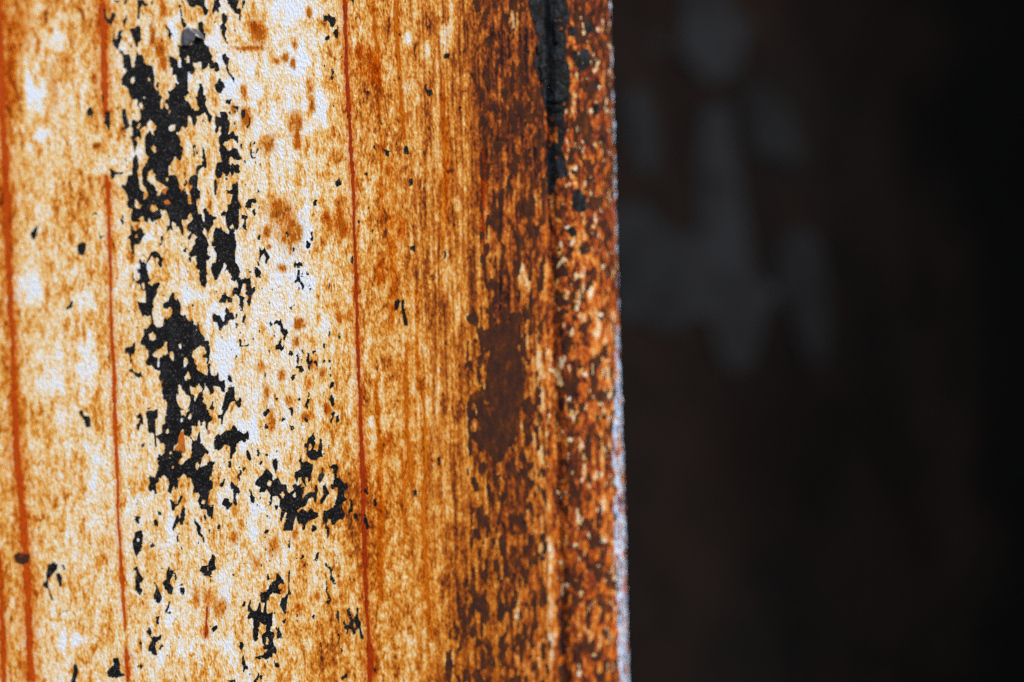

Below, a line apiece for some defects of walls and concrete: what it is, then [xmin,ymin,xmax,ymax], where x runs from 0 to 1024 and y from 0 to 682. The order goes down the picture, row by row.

rust [0,1,36,682]
peeling [43,562,65,600]
rust [99,2,108,118]
rust [105,175,126,630]
peeling [87,0,377,682]
rust [237,22,265,51]
rust [264,201,300,253]
rust [326,0,384,682]
rust [401,343,434,638]
rust [445,0,625,682]
peeling [523,0,597,202]
peeling [561,186,587,248]